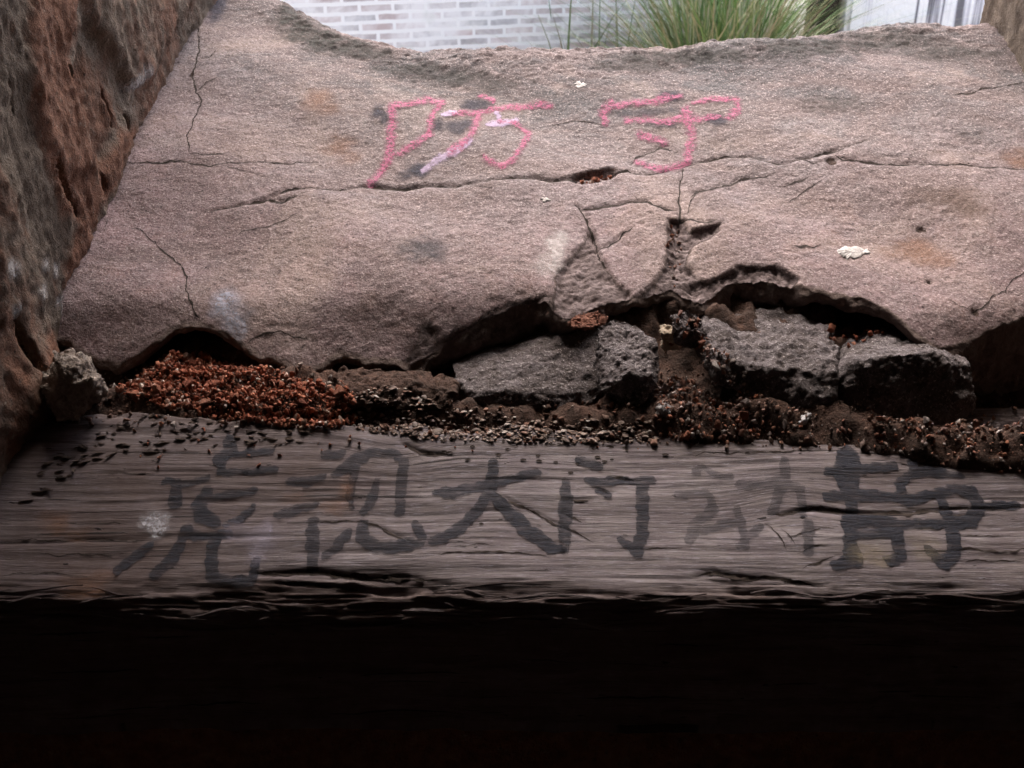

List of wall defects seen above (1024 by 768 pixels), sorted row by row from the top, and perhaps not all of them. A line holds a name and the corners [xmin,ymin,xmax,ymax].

crack [129,27,1024,271]
crack [105,223,200,320]
crack [948,272,1024,315]